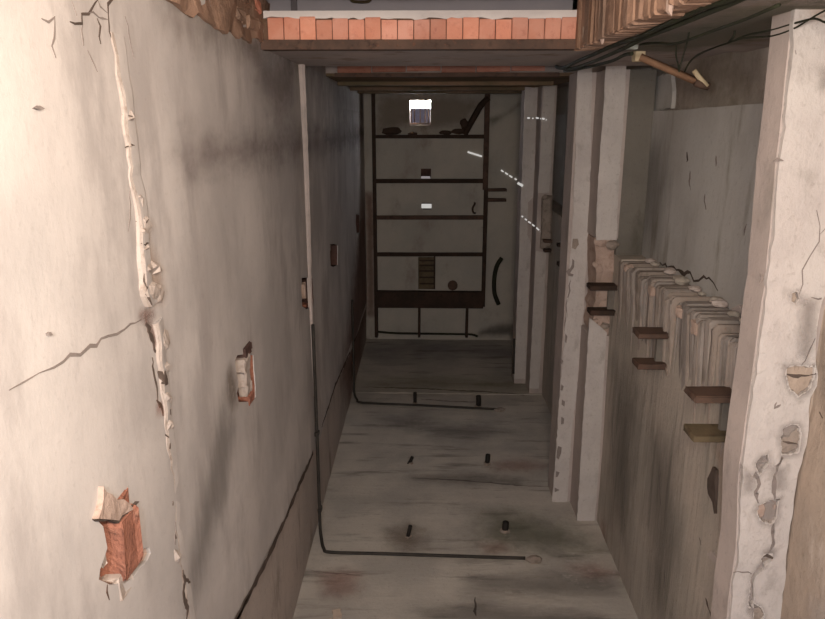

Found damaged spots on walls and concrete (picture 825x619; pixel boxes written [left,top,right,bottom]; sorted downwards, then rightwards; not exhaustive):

crack [41,0,134,72]
spalling [110,32,165,308]
spalling [583,234,620,335]
crack [659,262,718,291]
crack [9,274,171,449]
spalling [787,365,816,395]
spalling [152,317,196,619]
spalling [781,425,799,453]